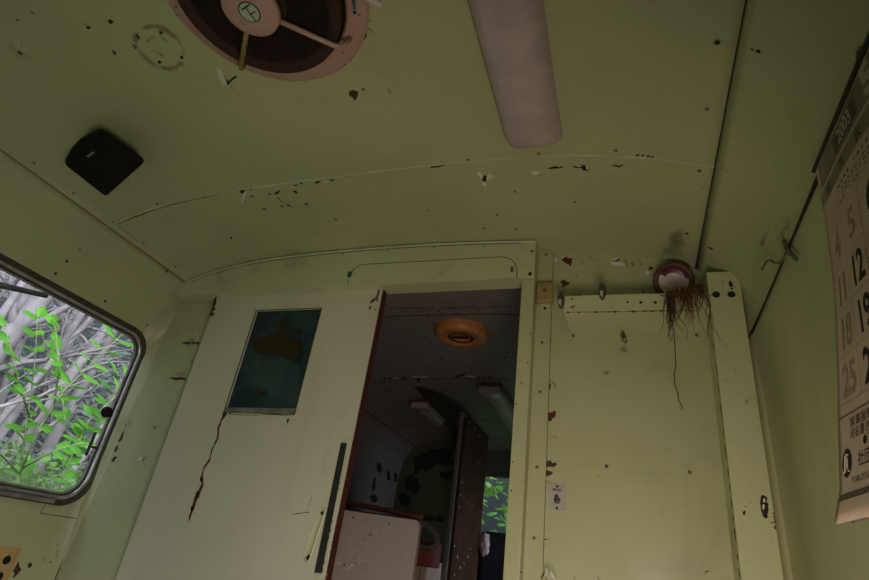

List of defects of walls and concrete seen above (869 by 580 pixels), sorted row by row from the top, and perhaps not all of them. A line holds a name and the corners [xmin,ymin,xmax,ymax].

crack [188,412,231,521]